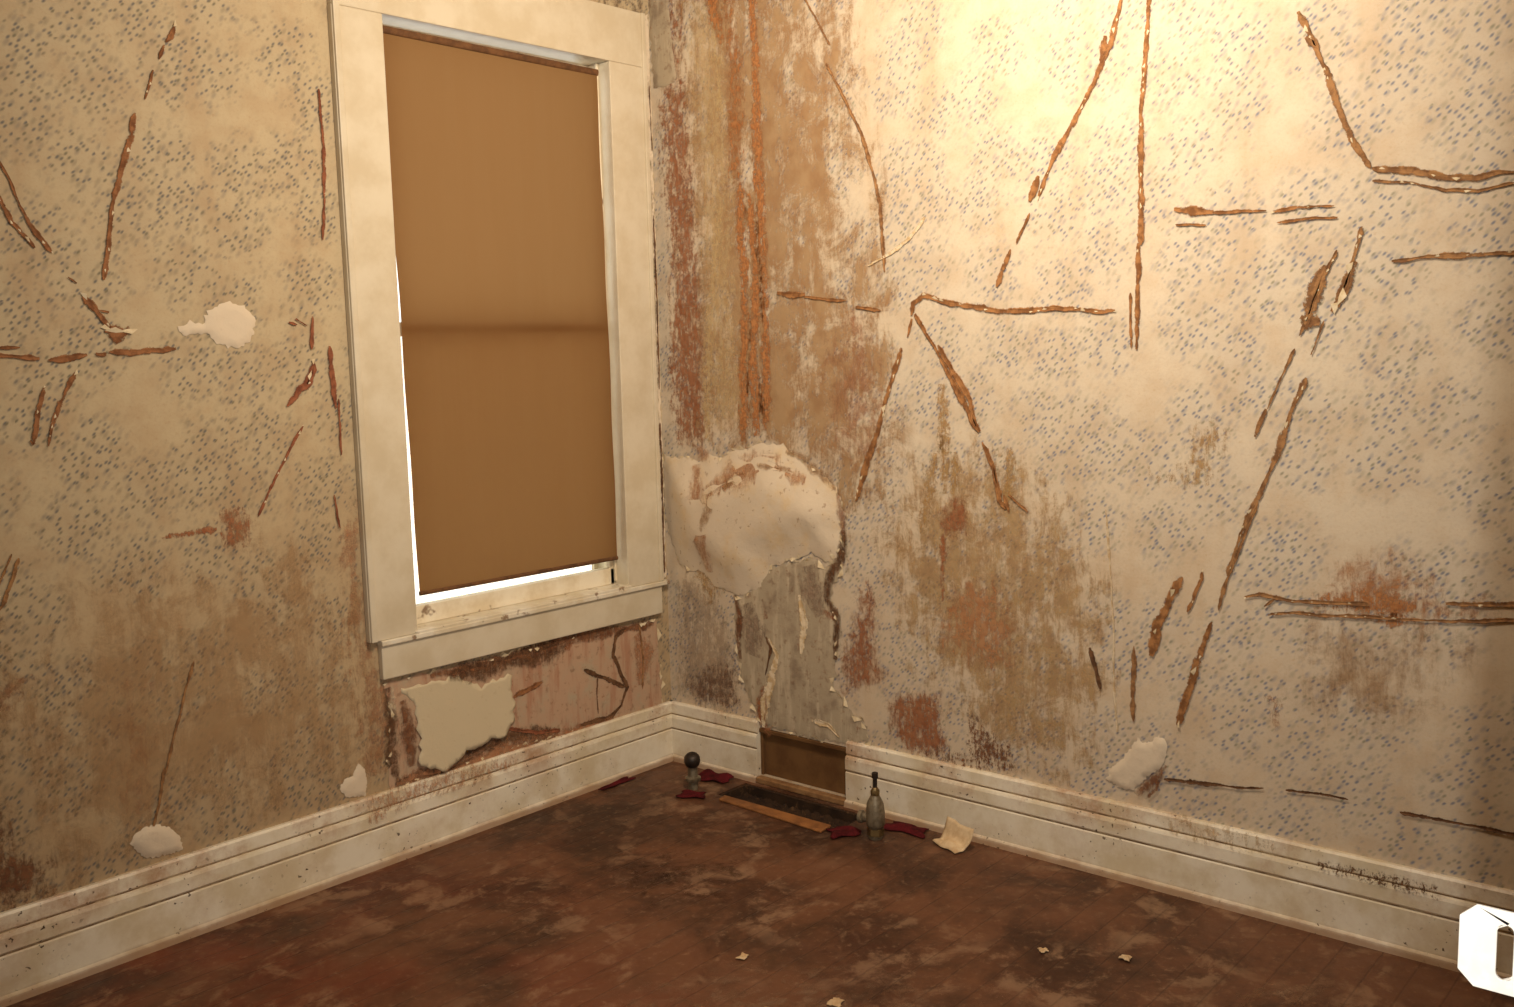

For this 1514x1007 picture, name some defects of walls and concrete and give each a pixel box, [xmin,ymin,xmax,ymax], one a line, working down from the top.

crack [0,20,177,284]
crack [318,89,327,240]
water stain [659,0,901,513]
crack [0,345,176,446]
crack [328,346,342,455]
crack [777,0,1514,728]
crack [0,554,20,611]
peeling [369,619,665,824]
spalling [733,531,872,746]
water stain [883,384,1110,771]
crack [1164,778,1348,800]
crack [1400,811,1514,836]